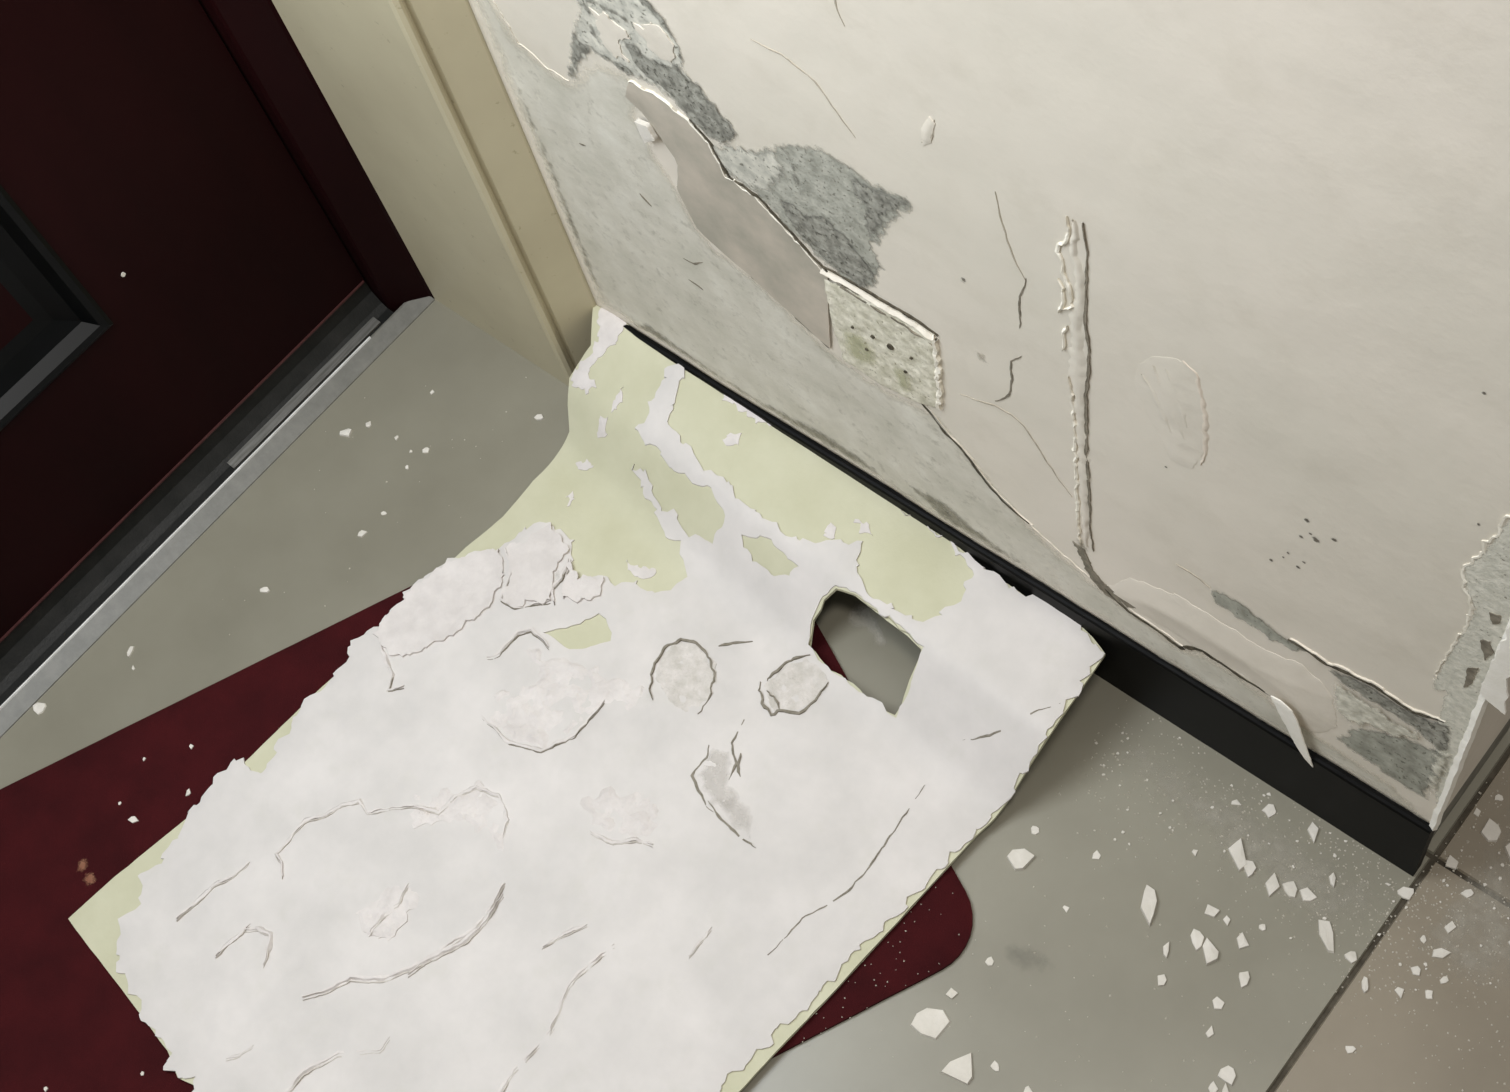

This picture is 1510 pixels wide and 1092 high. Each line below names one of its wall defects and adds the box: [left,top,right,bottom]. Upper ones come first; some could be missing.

crack [750,39,855,137]
peeling [479,0,1510,831]
crack [922,192,1268,695]
spalling [1007,826,1039,871]
spalling [1296,822,1347,888]
spalling [1436,794,1510,903]